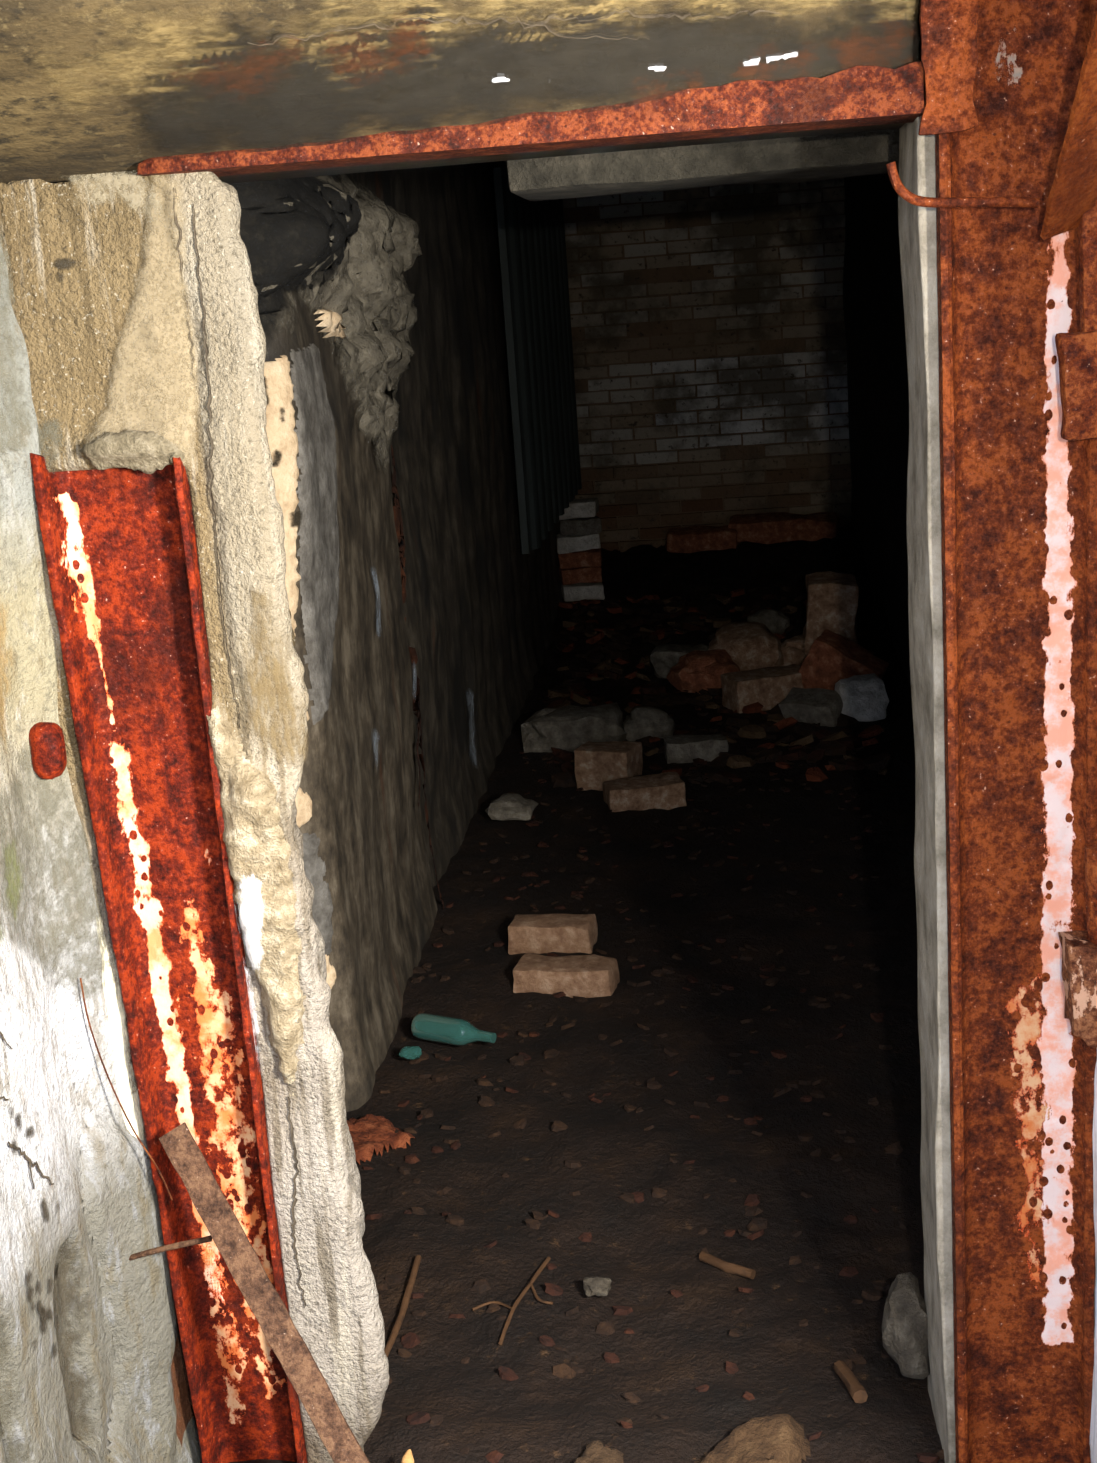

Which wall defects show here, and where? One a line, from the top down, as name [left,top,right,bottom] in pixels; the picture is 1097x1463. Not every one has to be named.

water stain [392,0,449,33]
water stain [564,0,643,19]
water stain [105,24,219,90]
spalling [262,174,423,725]
crack [8,1142,54,1189]
corrosion [171,1320,197,1446]